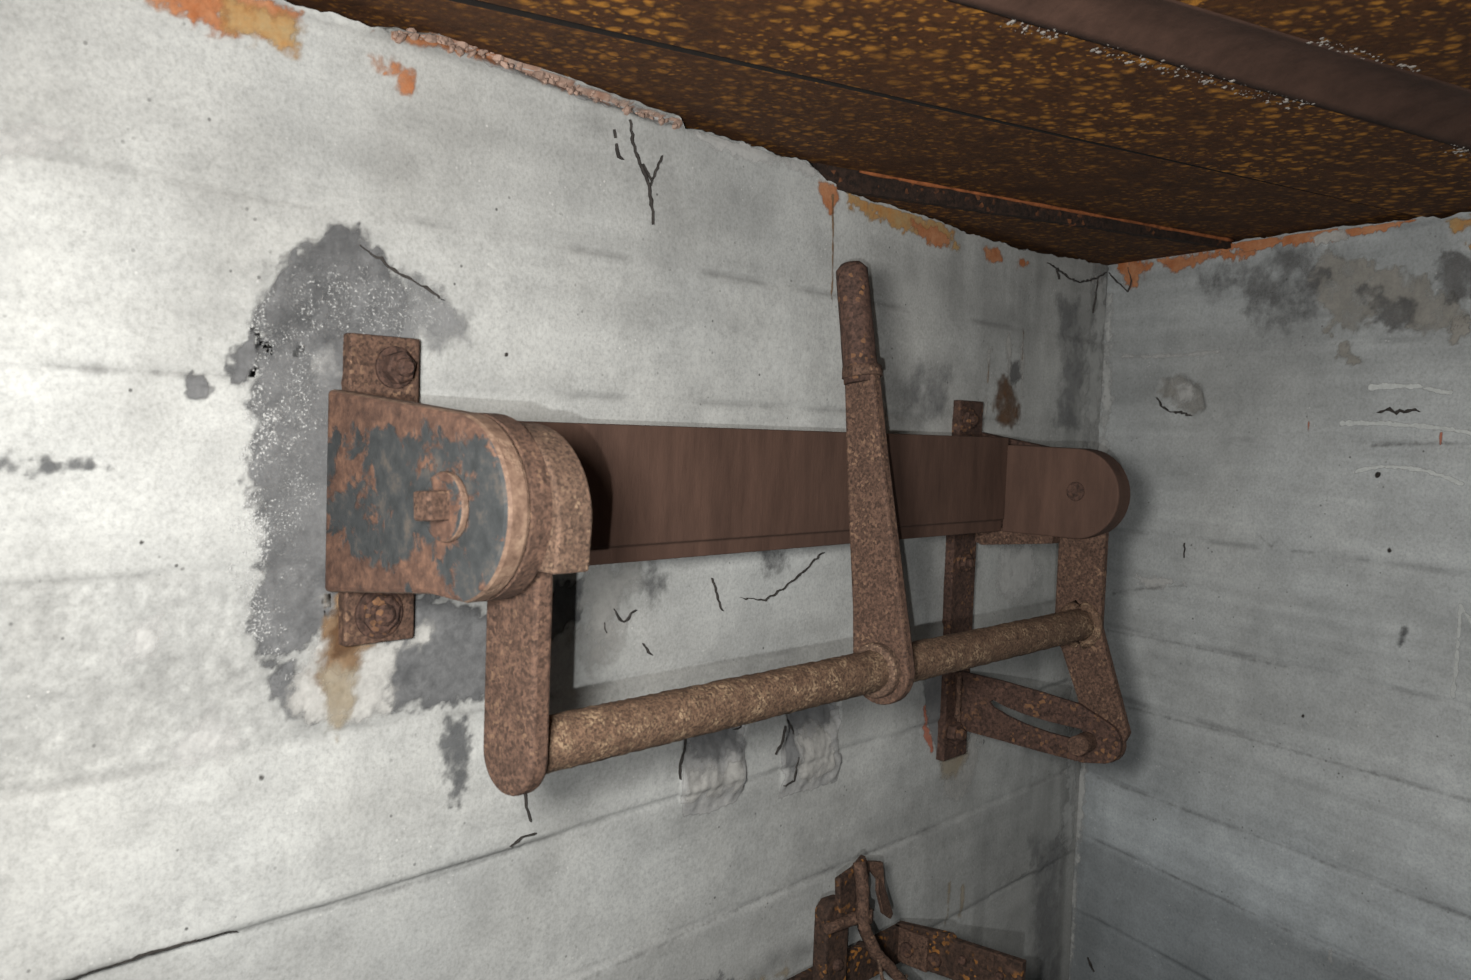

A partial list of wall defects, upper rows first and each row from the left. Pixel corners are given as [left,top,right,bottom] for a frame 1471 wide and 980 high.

rust [383,62,416,95]
crack [613,119,663,225]
rust [818,182,960,296]
rust [859,171,1415,288]
crack [1048,263,1132,313]
leakage [1356,284,1414,329]
leakage [1437,252,1471,305]
leakage [185,371,213,399]
leakage [225,222,487,725]
crack [711,552,825,611]
rust [316,594,373,728]
crack [65,931,238,980]